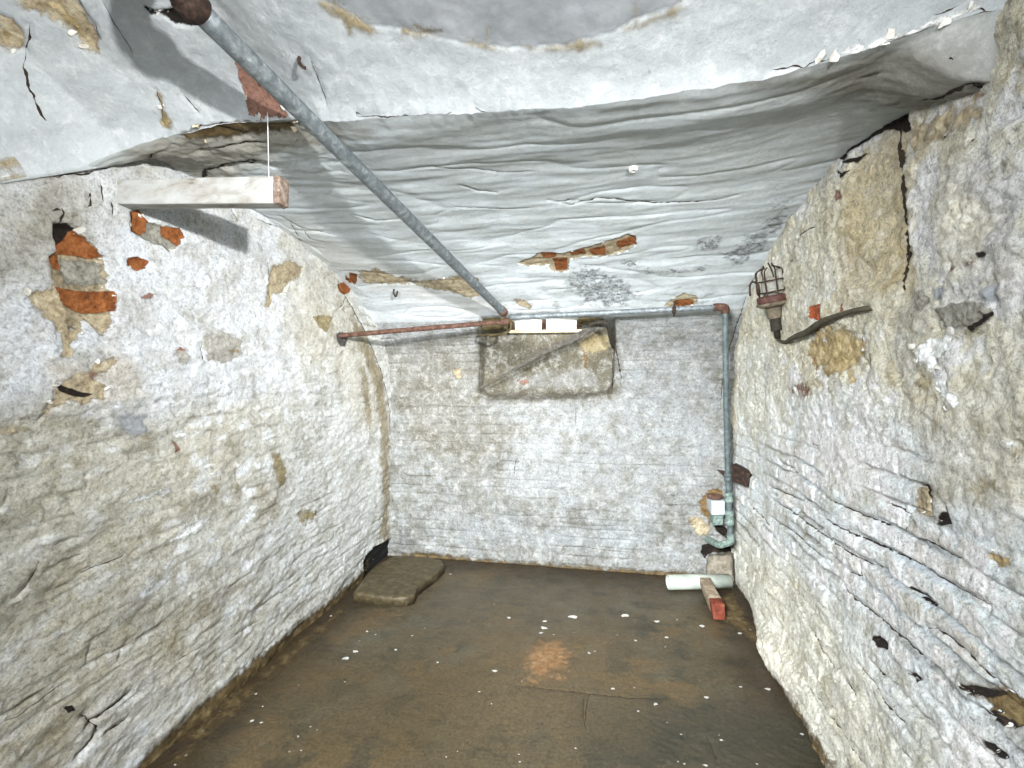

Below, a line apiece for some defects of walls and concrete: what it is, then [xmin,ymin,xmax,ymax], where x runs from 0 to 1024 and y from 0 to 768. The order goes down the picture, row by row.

crack [23,27,46,120]
spalling [156,62,298,143]
spalling [23,223,118,358]
spalling [264,260,303,307]
spalling [517,234,637,272]
crack [837,153,867,178]
crack [897,130,912,291]
peeling [44,356,116,414]
spalling [790,304,866,397]
crack [751,463,1008,687]
crack [76,695,126,755]
crack [803,611,932,768]